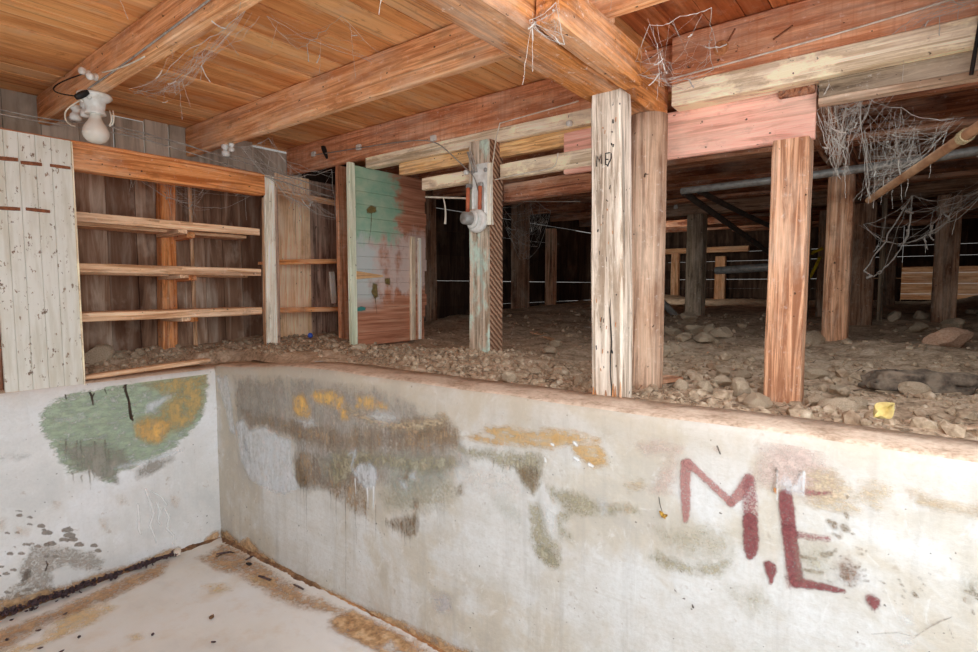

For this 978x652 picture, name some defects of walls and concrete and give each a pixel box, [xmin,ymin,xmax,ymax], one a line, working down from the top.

water stain [217,377,541,537]
water stain [530,489,594,566]